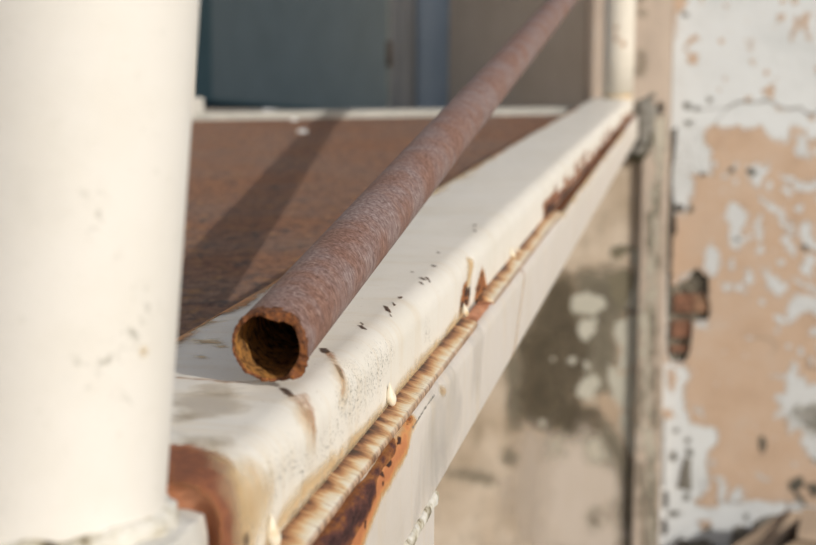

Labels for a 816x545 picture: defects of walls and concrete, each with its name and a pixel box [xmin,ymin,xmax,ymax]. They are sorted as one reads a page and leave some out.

corrosion [459,259,487,316]
peeling [567,93,816,545]
water stain [506,267,658,545]
corrosion [167,444,253,545]
corrosion [352,415,416,545]